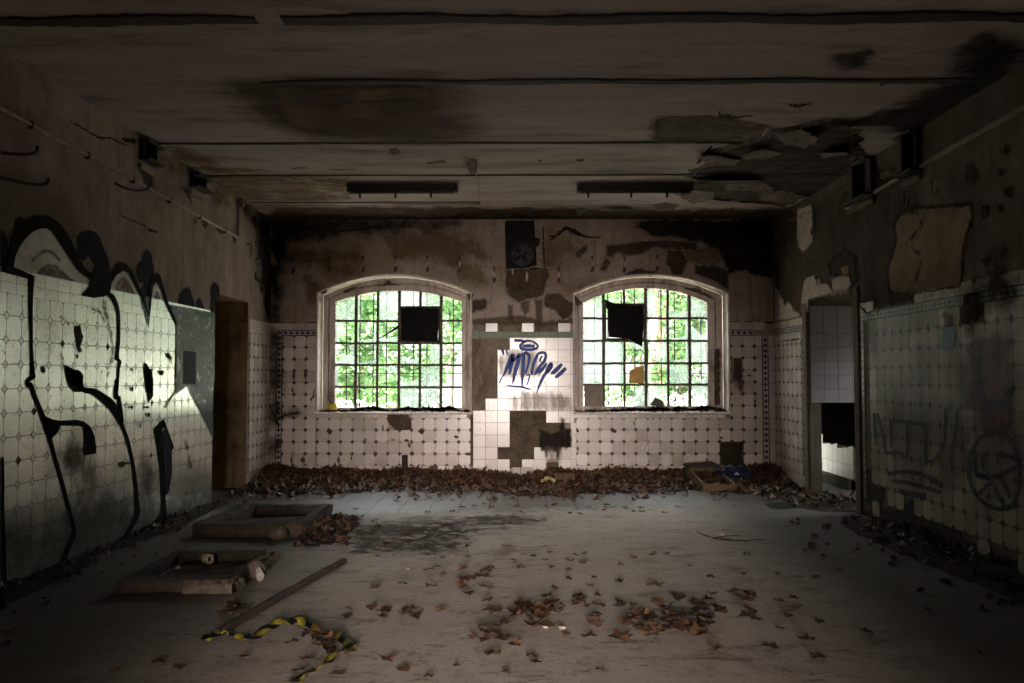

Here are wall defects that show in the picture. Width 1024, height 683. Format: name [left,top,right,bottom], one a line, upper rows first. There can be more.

water stain [239,84,467,141]
water stain [824,33,1024,132]
spalling [647,115,1013,323]
water stain [167,147,791,423]
flaking render [590,238,730,300]
peeling [429,265,582,470]
peeling [714,349,751,406]
peeling [382,415,424,467]